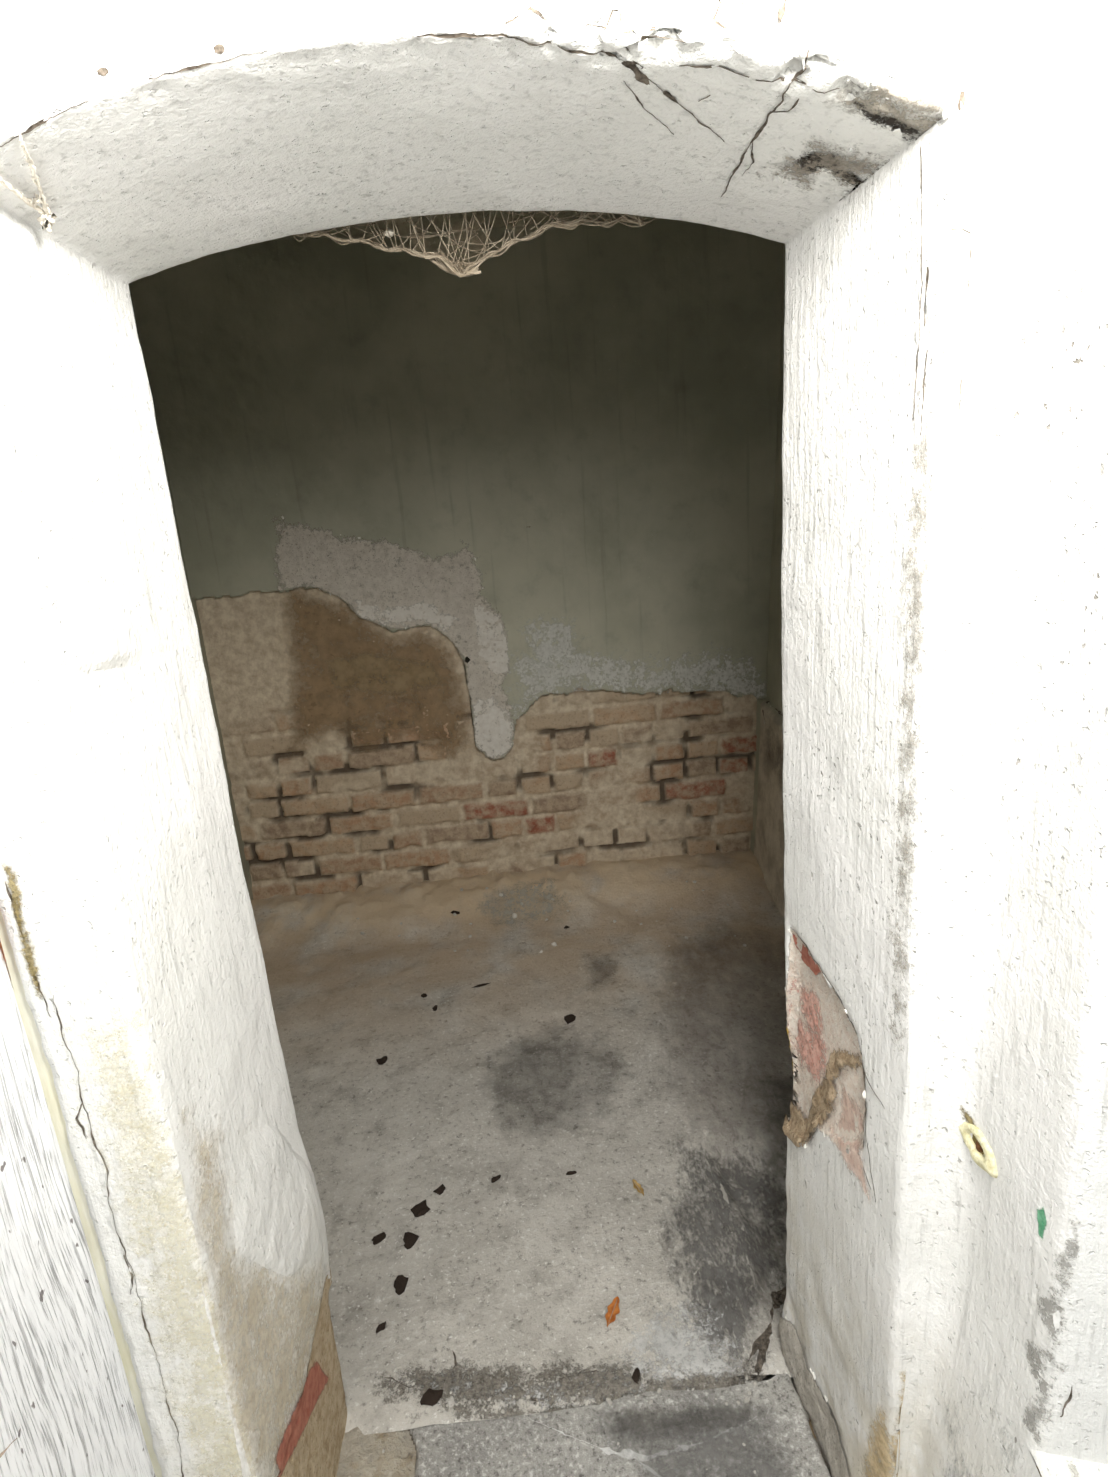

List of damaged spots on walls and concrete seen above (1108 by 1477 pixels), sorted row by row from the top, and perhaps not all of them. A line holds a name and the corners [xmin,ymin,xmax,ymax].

crack [624,0,809,197]
flaking render [195,516,757,899]
flaking render [782,928,866,1193]
leakage [581,1142,787,1393]